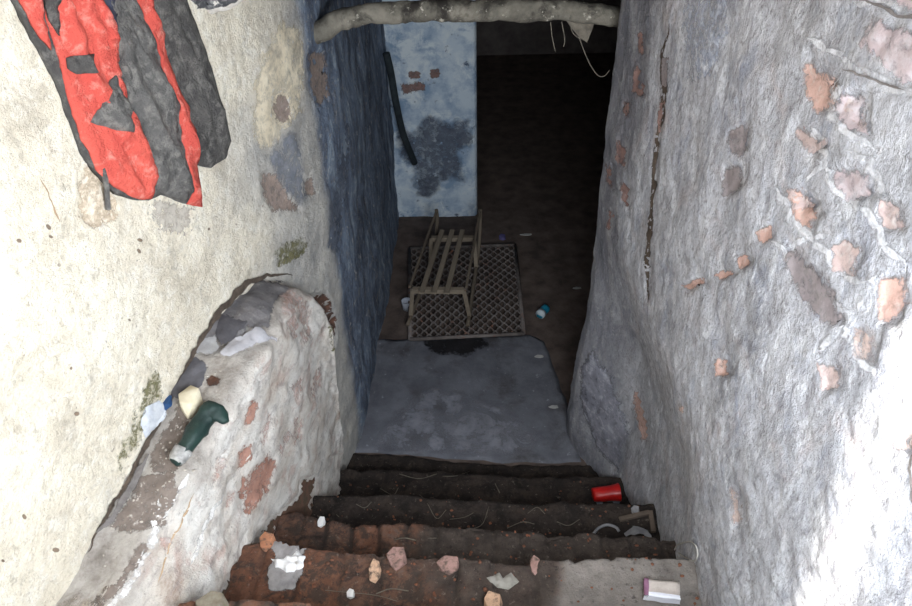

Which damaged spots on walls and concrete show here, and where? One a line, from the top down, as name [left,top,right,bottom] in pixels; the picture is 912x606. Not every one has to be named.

flaking render [857,0,912,11]
flaking render [807,19,912,95]
crack [644,27,669,303]
flaking render [722,125,750,197]
flaking render [771,64,910,376]
flaking render [245,401,258,425]
flaking render [714,358,729,376]
flaking render [816,363,839,391]
flaking render [226,416,303,515]